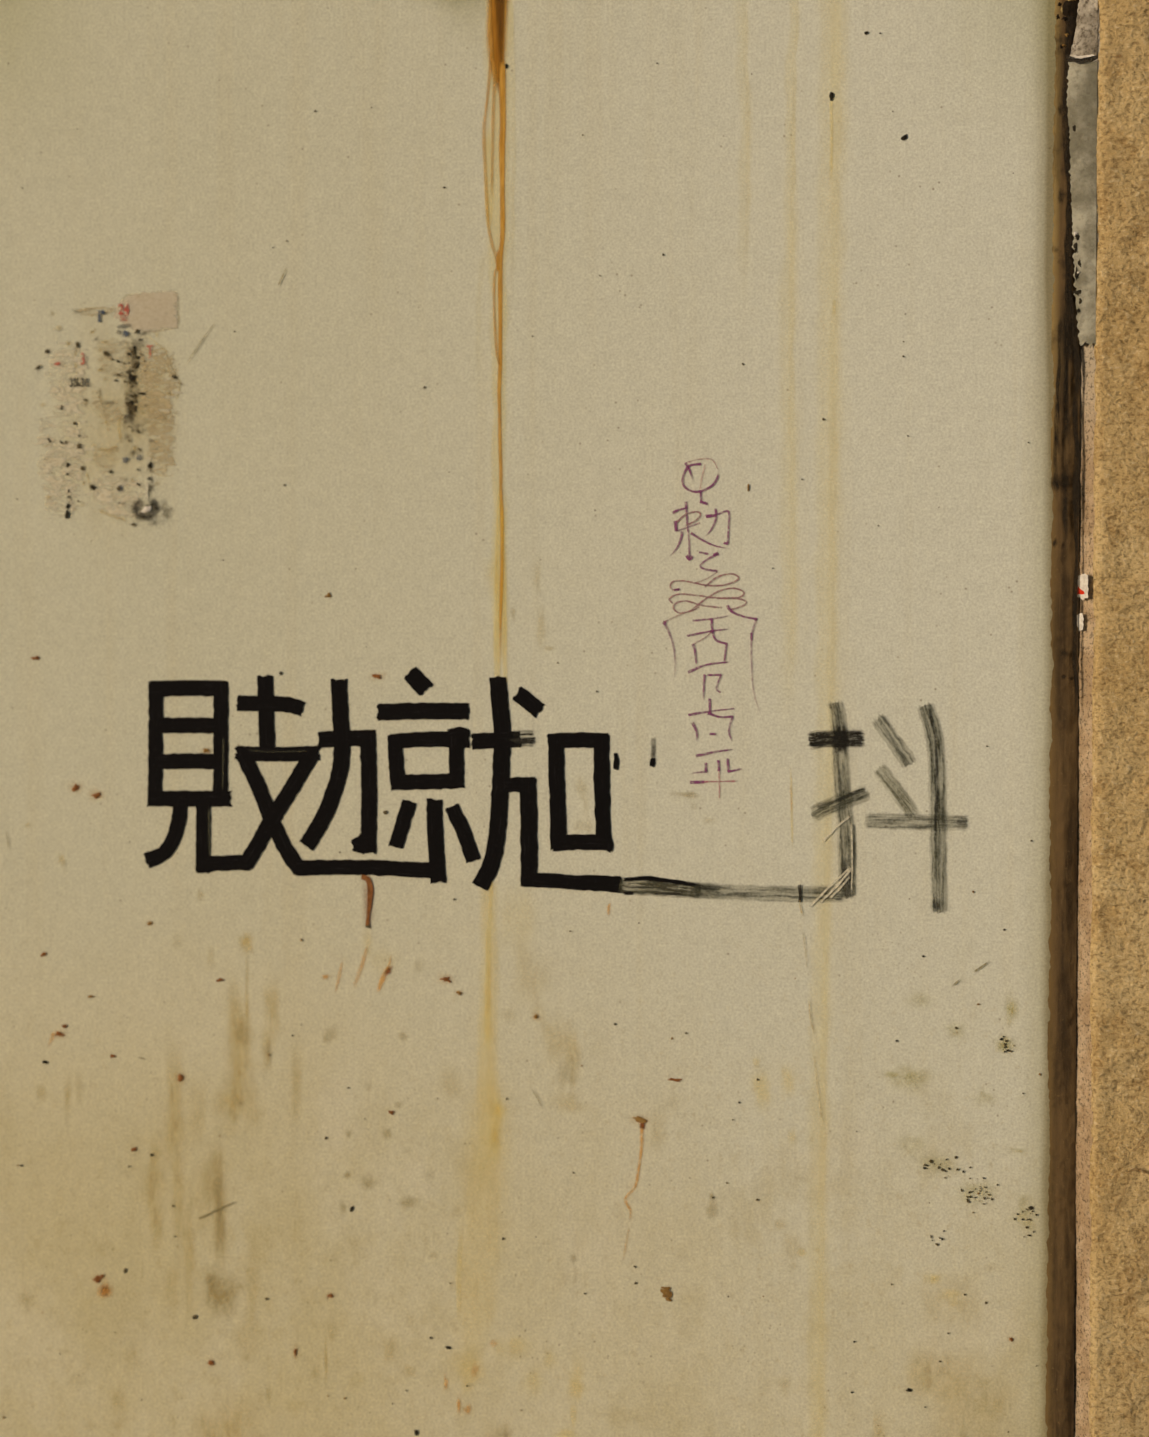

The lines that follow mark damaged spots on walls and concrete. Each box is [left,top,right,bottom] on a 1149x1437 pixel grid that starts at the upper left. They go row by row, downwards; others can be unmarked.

rust [488,0,507,630]
rust [361,875,373,928]
rust [633,1116,647,1187]
leakage [923,1159,998,1205]